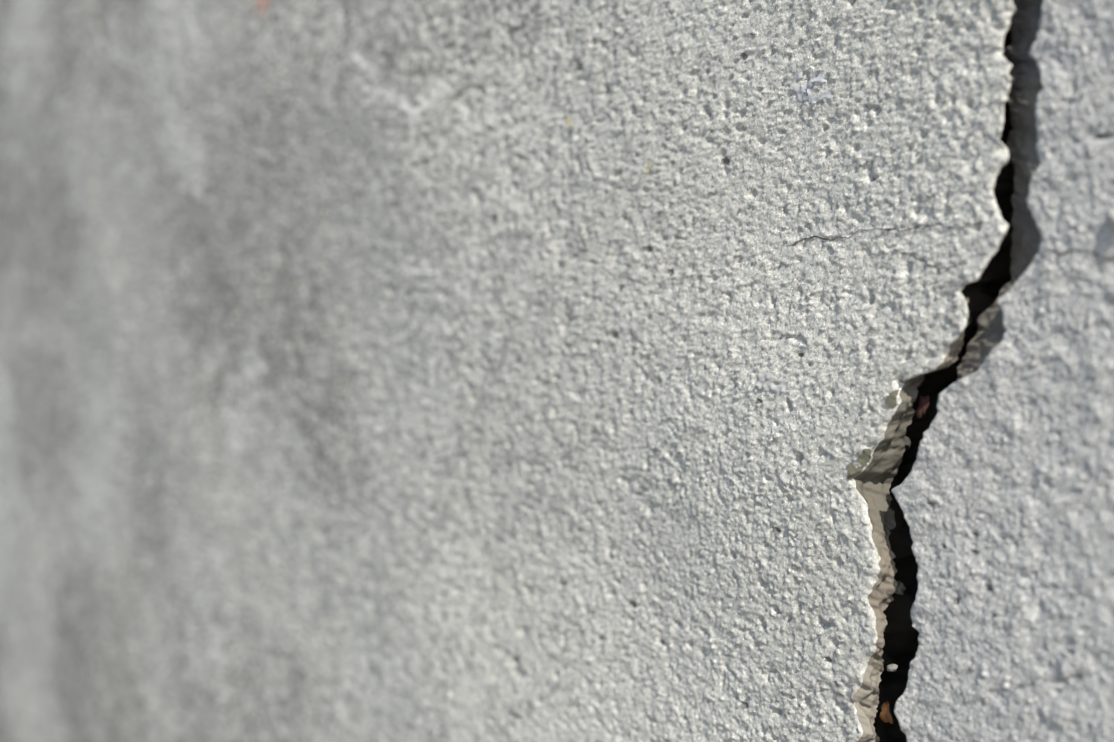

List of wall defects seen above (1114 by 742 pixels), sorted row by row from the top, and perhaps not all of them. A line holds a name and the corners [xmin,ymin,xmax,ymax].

crack [786,0,1114,742]